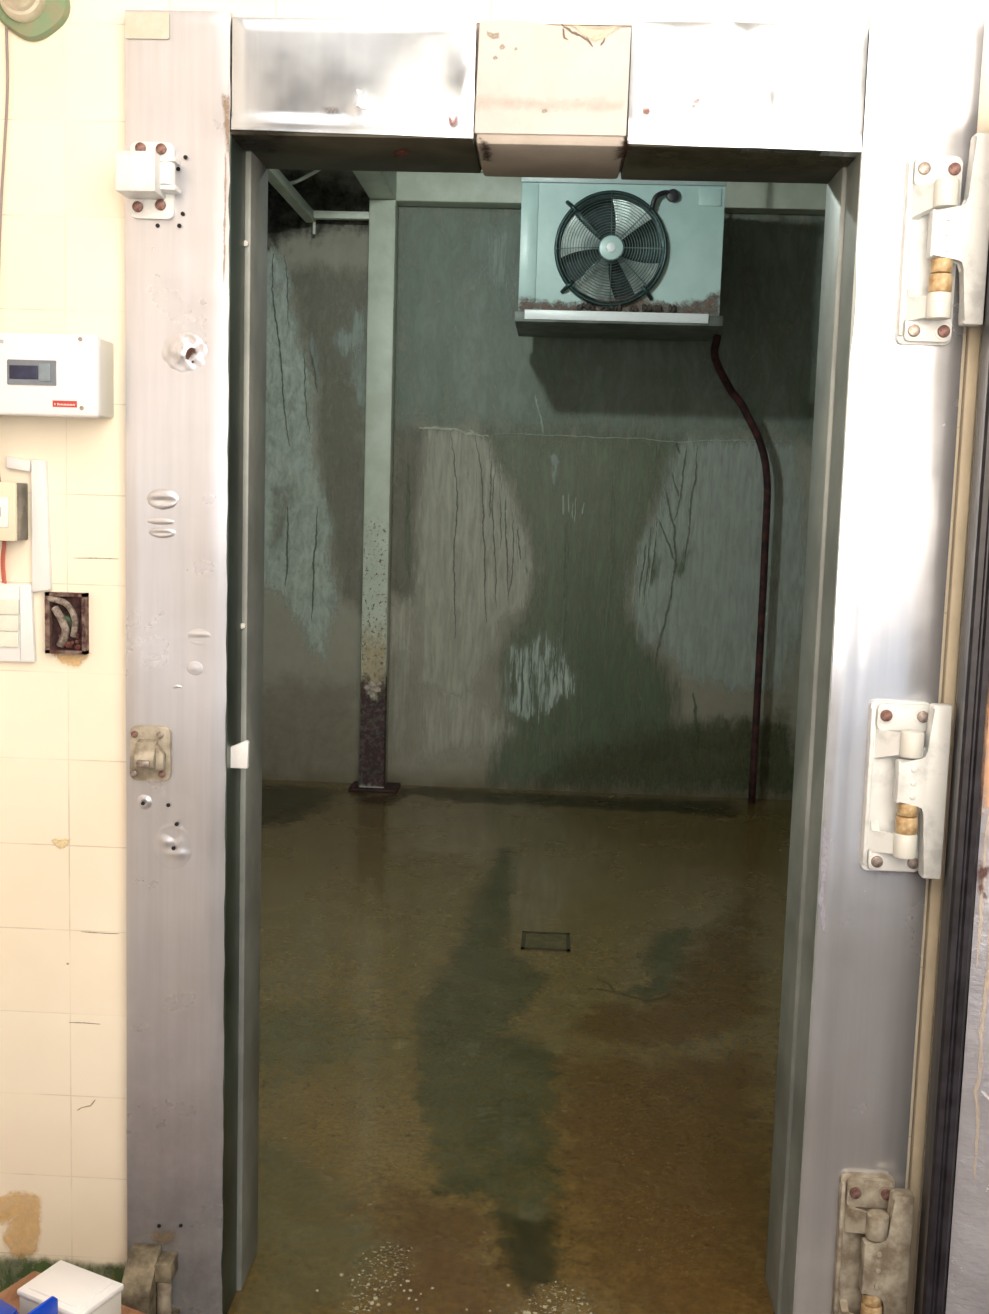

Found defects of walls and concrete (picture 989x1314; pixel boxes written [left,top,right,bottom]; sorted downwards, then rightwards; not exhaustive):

flaking render [474,20,631,179]
leakage [264,171,369,657]
leakage [389,206,825,793]
rust [359,521,388,787]
rust [978,730,989,946]
leakage [412,849,564,1284]
peeling [0,1194,39,1259]